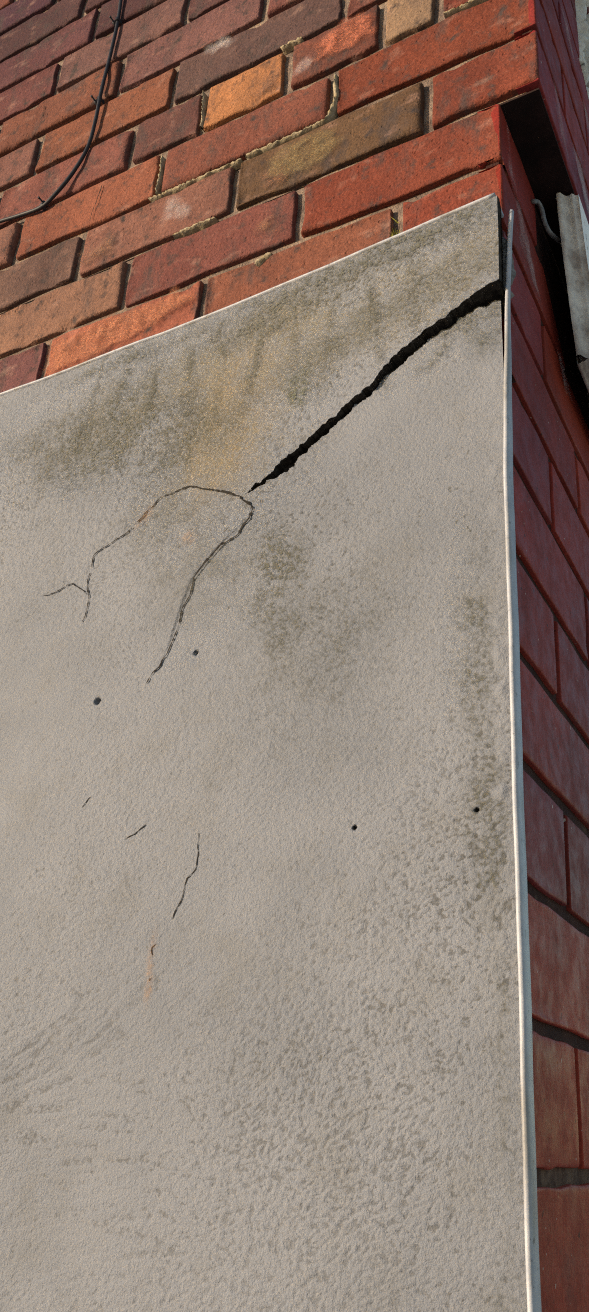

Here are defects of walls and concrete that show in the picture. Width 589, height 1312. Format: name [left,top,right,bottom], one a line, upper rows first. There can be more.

water stain [208,204,501,386]
crack [485,299,505,317]
water stain [30,346,224,481]
crack [280,434,327,474]
crack [43,486,253,683]
water stain [255,534,302,647]